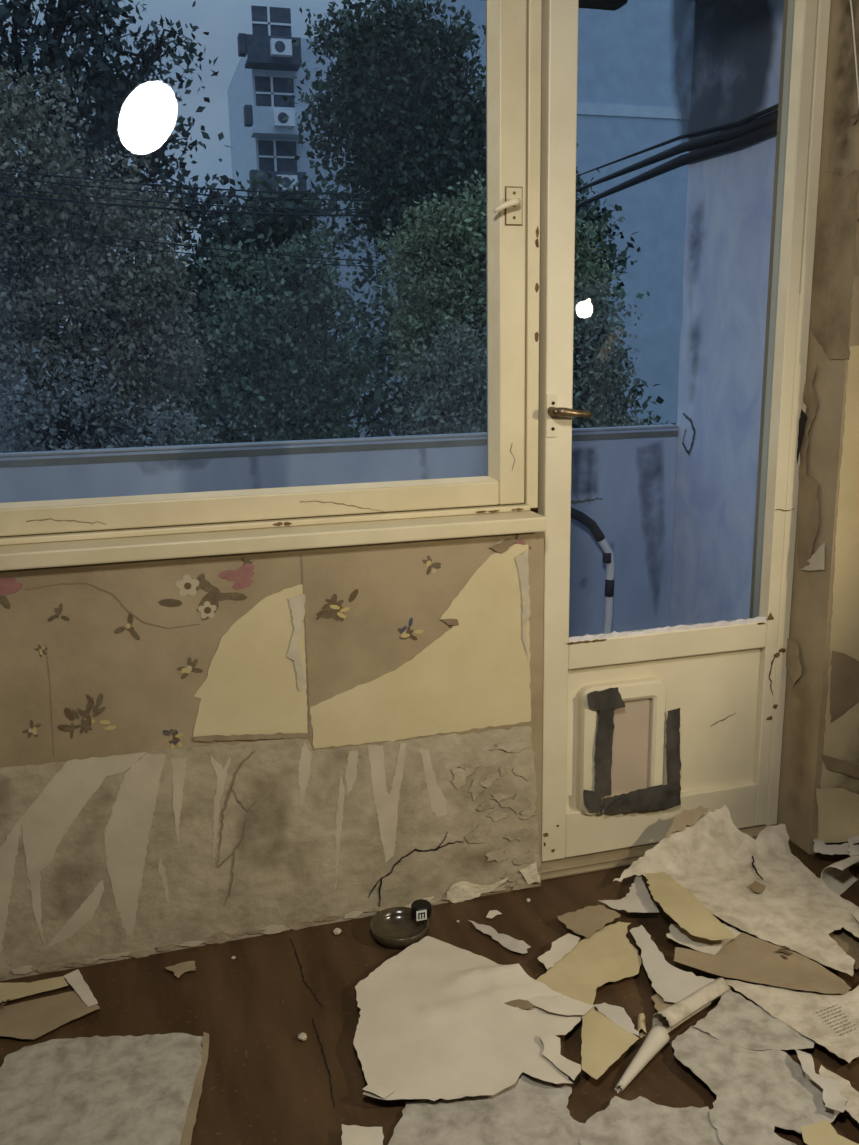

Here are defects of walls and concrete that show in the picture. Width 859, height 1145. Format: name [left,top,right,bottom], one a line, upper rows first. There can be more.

peeling [286,594,305,691]
crack [217,751,256,905]
flaking render [0,726,559,981]
crack [368,834,461,913]